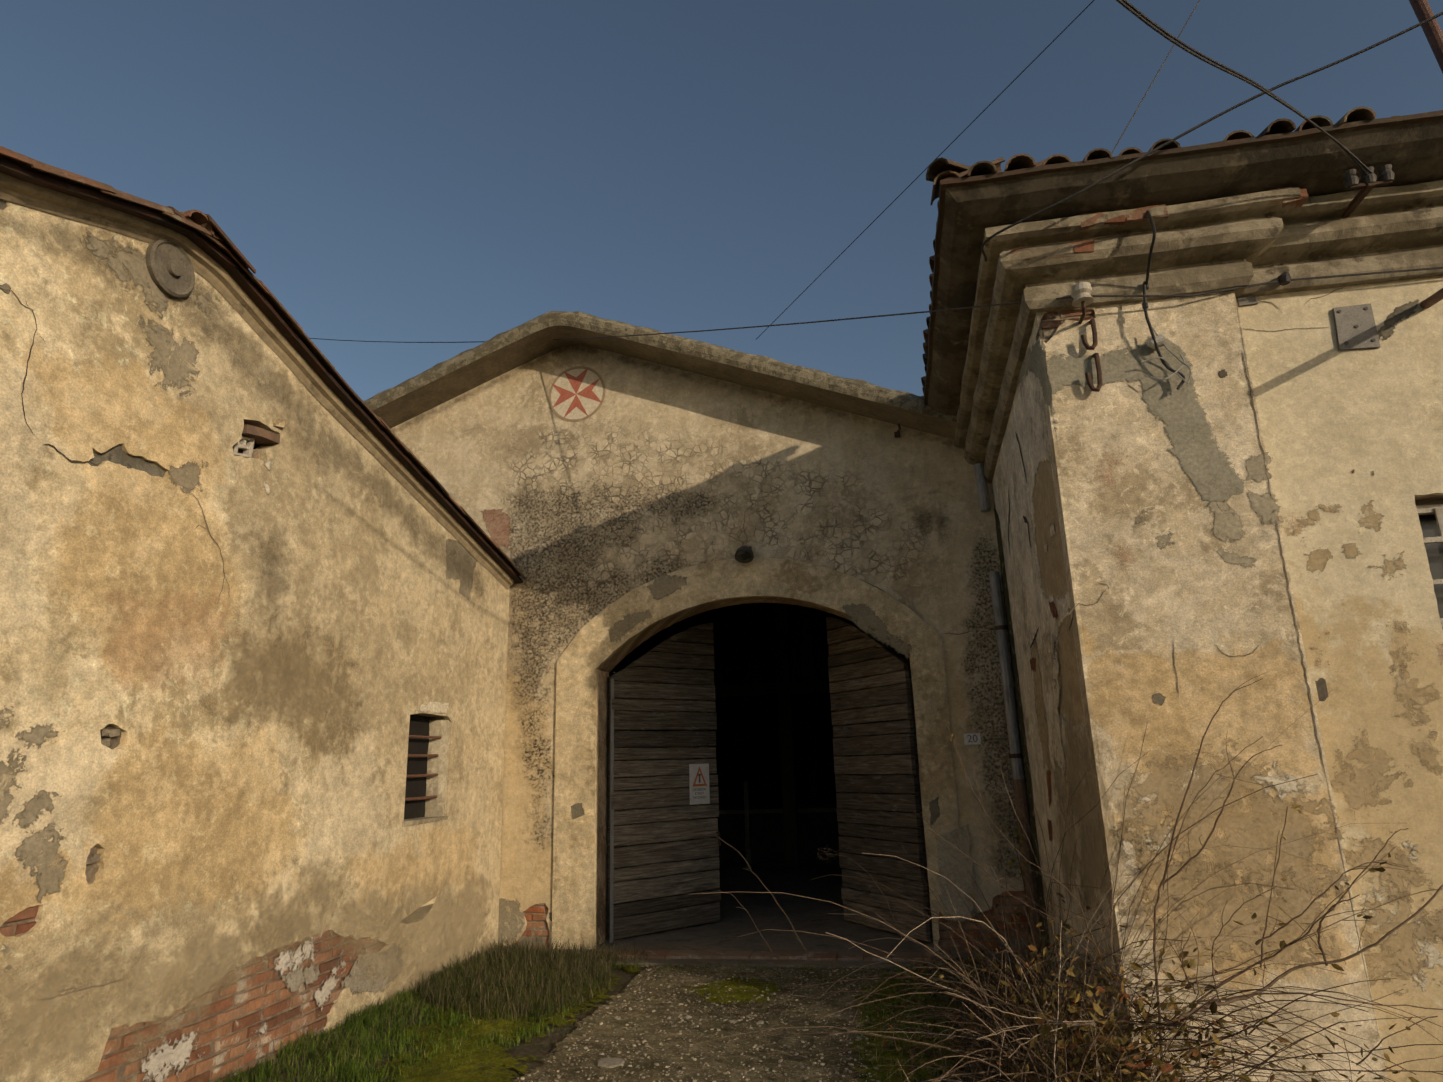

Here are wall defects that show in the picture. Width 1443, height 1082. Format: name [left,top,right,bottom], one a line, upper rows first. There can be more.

crack [1,288,98,466]
crack [191,493,230,607]
peeling [1135,509,1175,550]
crack [1241,287,1344,775]
flaking render [100,725,121,749]
leakage [504,479,714,849]
peeling [0,706,68,970]
flaking render [85,847,101,883]
flaking render [401,897,436,924]
flaking render [929,797,1032,952]
flaking render [79,930,403,1082]